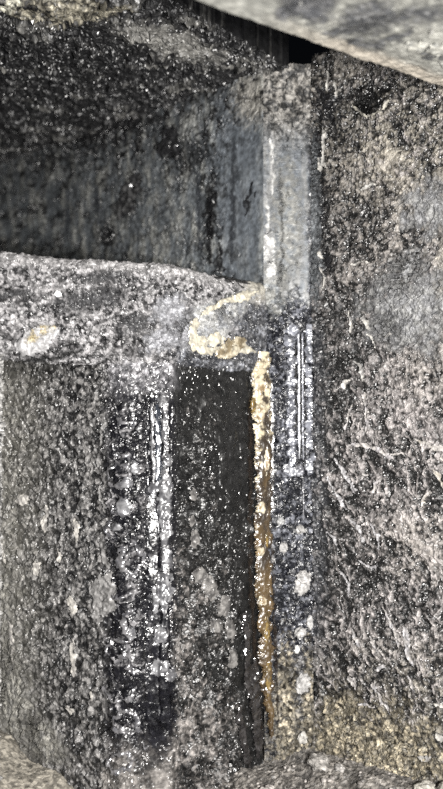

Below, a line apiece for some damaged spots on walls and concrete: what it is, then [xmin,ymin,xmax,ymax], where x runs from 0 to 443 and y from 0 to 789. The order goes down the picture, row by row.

corrosion [247,351,280,741]